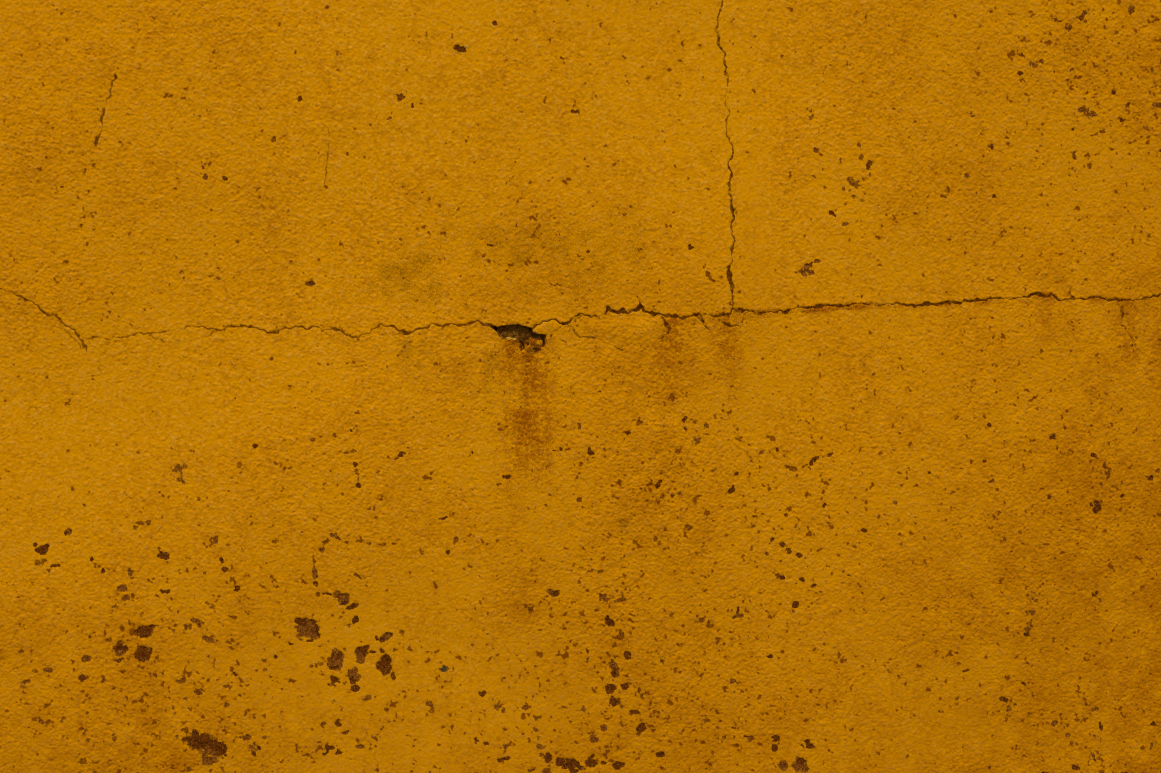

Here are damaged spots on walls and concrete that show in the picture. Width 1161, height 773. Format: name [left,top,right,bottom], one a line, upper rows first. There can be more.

crack [717,1,729,86]
crack [94,74,117,146]
crack [531,119,1161,350]
crack [0,288,166,348]
crack [197,320,496,338]
hole [494,324,546,353]
peeling [33,543,61,573]
peeling [312,533,386,627]
peeling [113,610,230,711]
peeling [289,617,320,645]
peeling [599,588,627,636]
peeling [175,726,227,772]